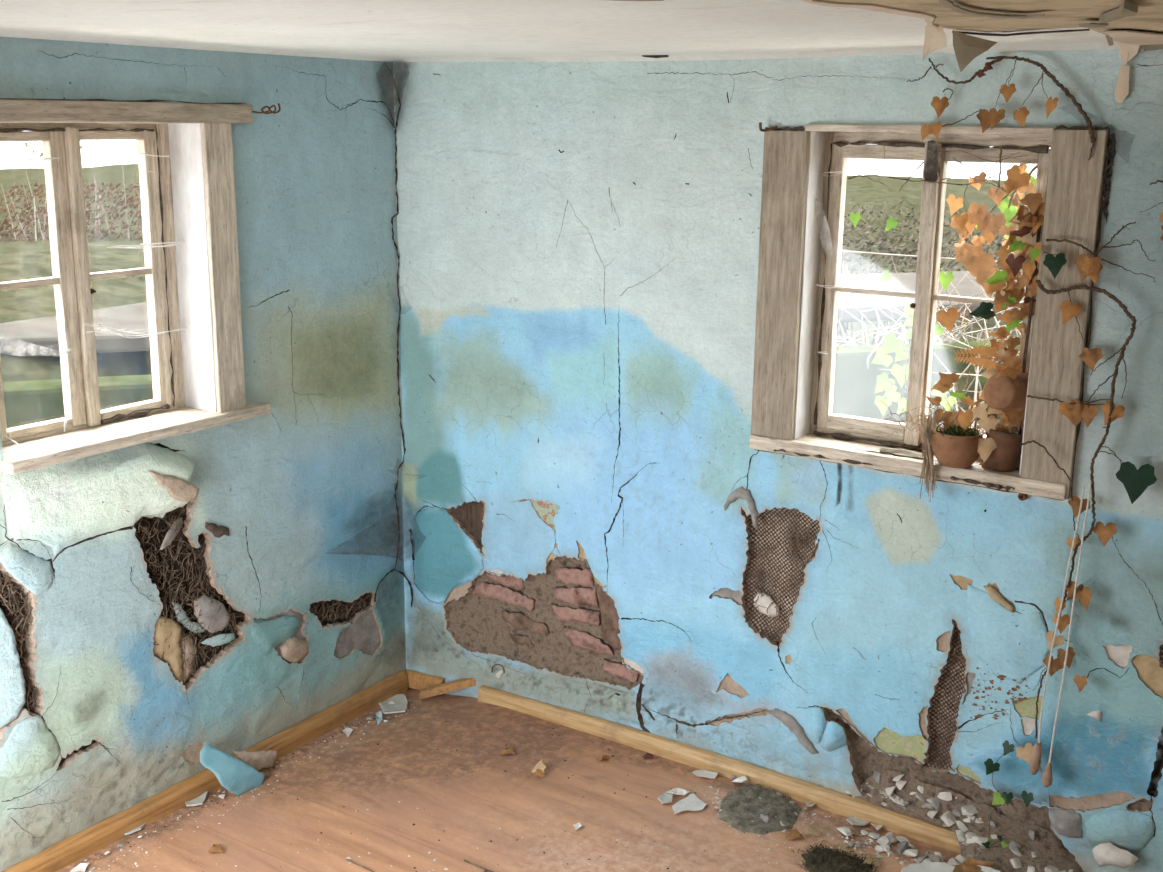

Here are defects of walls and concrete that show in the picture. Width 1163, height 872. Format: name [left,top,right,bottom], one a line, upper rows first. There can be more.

crack [273,63,529,672]
crack [556,199,676,592]
flaking render [0,542,100,778]
flaking render [130,501,382,689]
flaking render [444,499,645,690]
crack [621,618,692,642]
crack [584,681,766,741]
flaking render [709,507,820,664]
flaking render [705,619,1163,854]
flaking render [1092,842,1139,869]
crack [1112,536,1163,625]
crack [1147,727,1163,837]